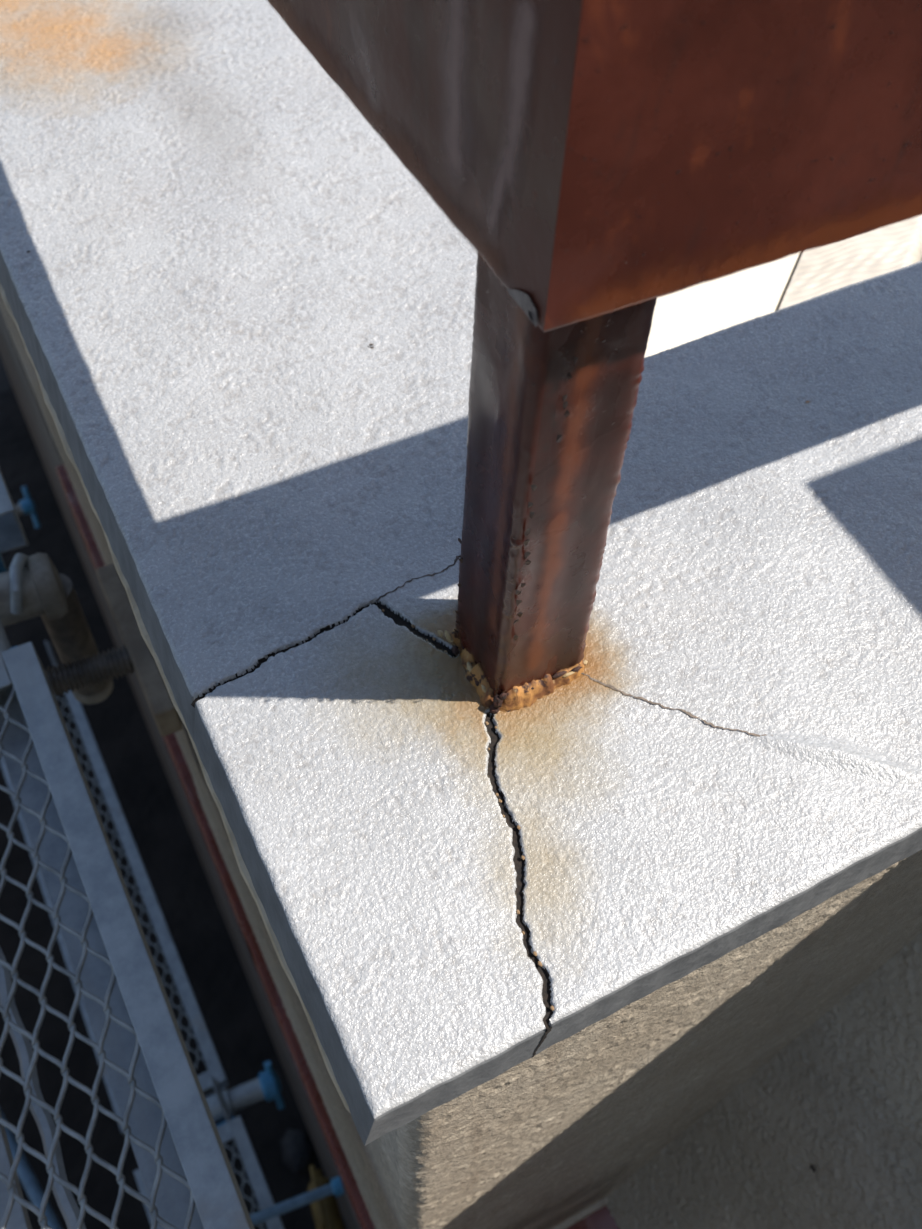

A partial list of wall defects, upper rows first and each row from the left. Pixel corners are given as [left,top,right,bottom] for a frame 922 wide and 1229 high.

crack [191,556,459,708]
corrosion [421,608,616,750]
crack [581,673,766,737]
crack [485,716,554,1057]